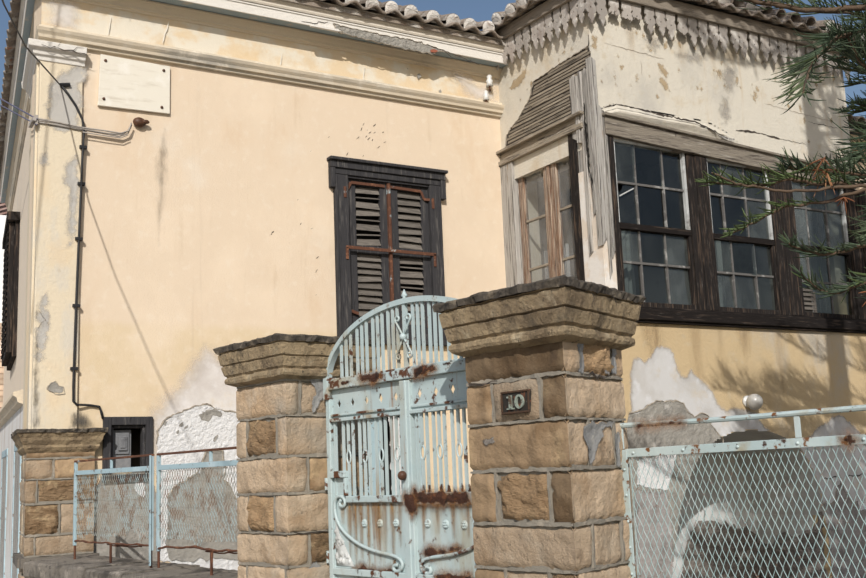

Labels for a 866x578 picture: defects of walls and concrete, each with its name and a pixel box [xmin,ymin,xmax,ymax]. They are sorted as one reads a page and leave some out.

peeling [47,66,87,132]
spalling [505,36,597,147]
crack [736,130,804,144]
peeling [64,155,79,244]
spalling [47,381,65,395]
rust [358,371,382,386]
rust [413,362,450,380]
rust [636,420,682,429]
spalling [93,350,241,570]
flaking render [627,346,866,578]
rust [348,483,471,545]
rust [422,544,462,560]